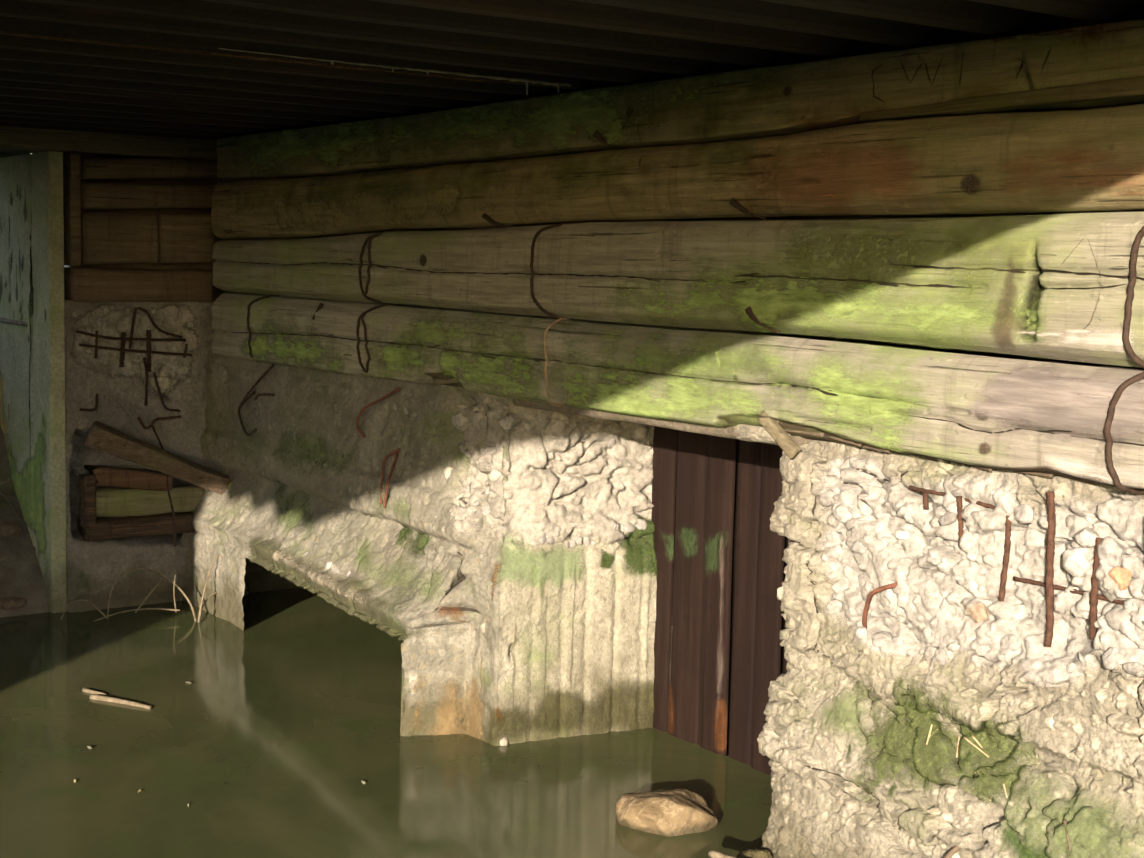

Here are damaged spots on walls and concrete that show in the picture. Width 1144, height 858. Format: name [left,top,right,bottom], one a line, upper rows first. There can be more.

spalling [425,373,655,548]
crack [432,548,481,614]
spalling [715,414,1144,684]
leakage [489,685,654,739]
rust [715,701,727,750]